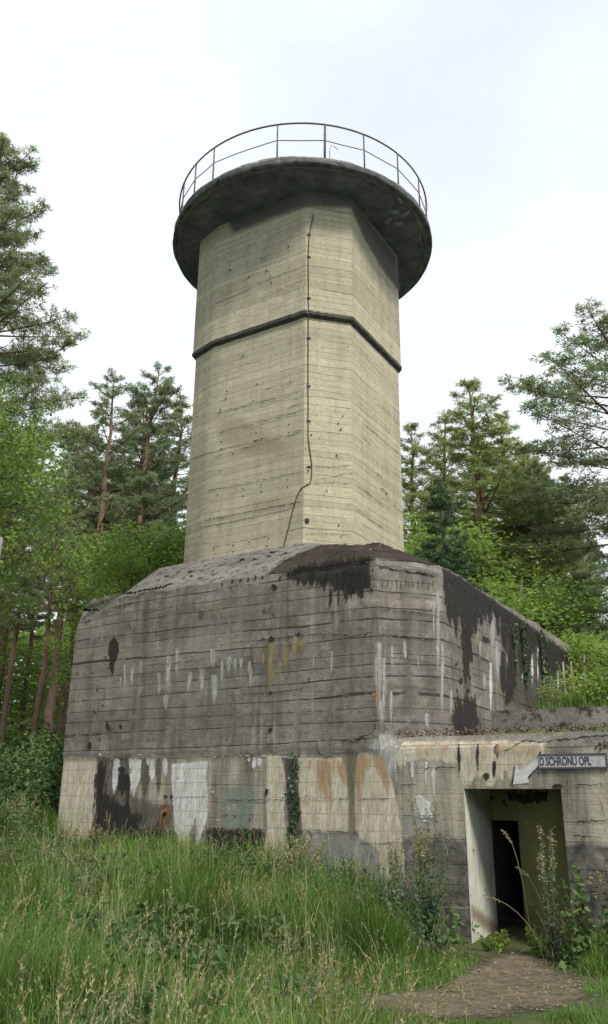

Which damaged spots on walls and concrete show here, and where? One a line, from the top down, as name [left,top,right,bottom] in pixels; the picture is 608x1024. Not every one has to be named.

water stain [188,650,251,698]
water stain [372,565,573,794]
water stain [99,757,172,848]
water stain [207,827,265,853]